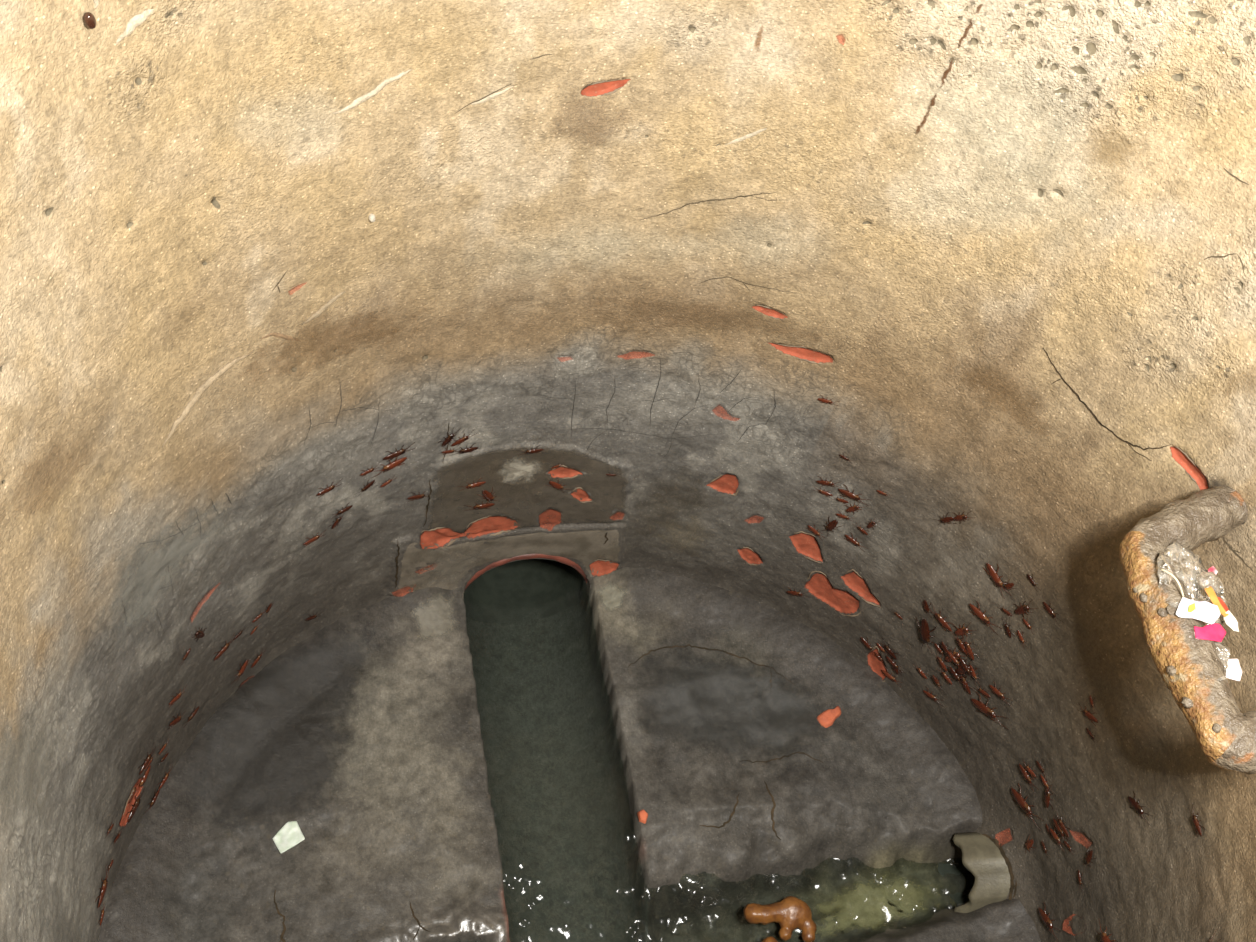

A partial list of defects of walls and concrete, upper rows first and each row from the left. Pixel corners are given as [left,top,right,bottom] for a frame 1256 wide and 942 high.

spalling [909,38,955,64]
spalling [581,79,631,96]
spalling [769,343,833,365]
crack [1043,348,1171,461]
spalling [1170,446,1208,490]
spalling [547,465,592,503]
spalling [707,474,739,496]
spalling [420,516,517,550]
spalling [539,509,561,531]
spalling [590,559,619,577]
spalling [789,531,881,617]